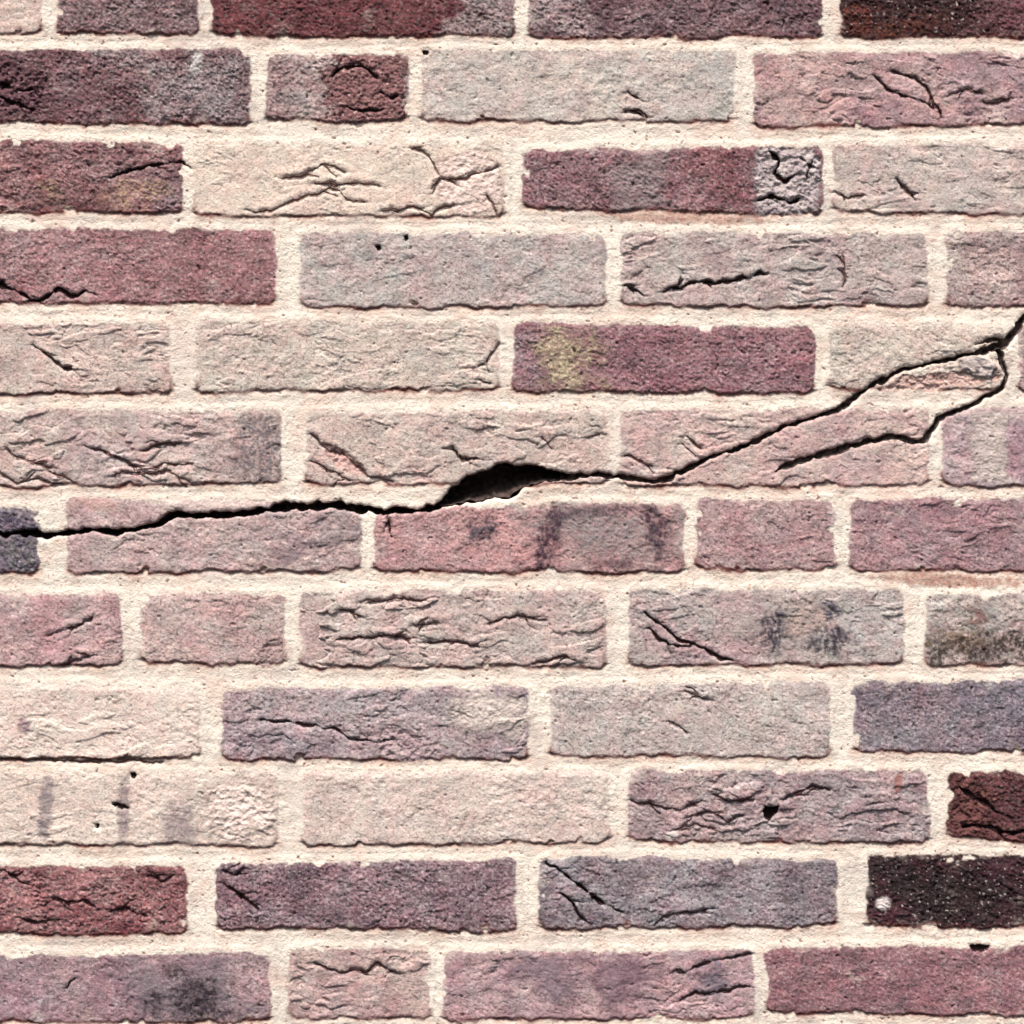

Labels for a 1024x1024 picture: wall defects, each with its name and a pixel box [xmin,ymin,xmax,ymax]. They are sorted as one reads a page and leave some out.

crack [0,314,1024,539]